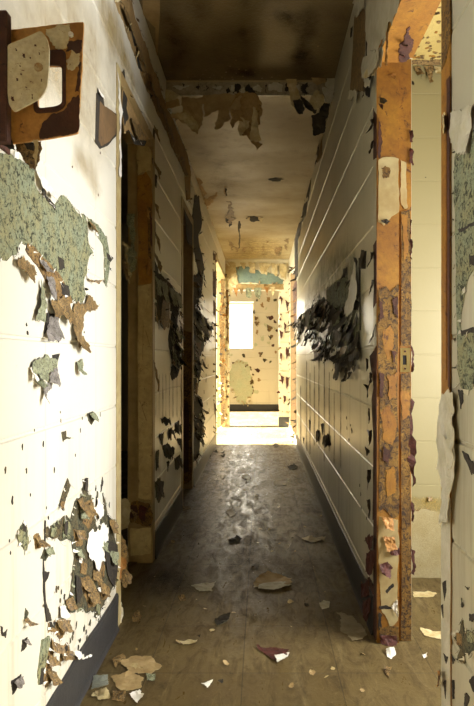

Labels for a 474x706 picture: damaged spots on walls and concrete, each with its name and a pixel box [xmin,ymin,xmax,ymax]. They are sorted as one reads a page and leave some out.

peeling [30,354,61,404]
peeling [0,139,113,375]
peeling [95,0,414,659]
peeling [408,398,417,487]
peeling [411,105,474,706]
peeling [11,674,25,695]
peeling [9,477,132,689]